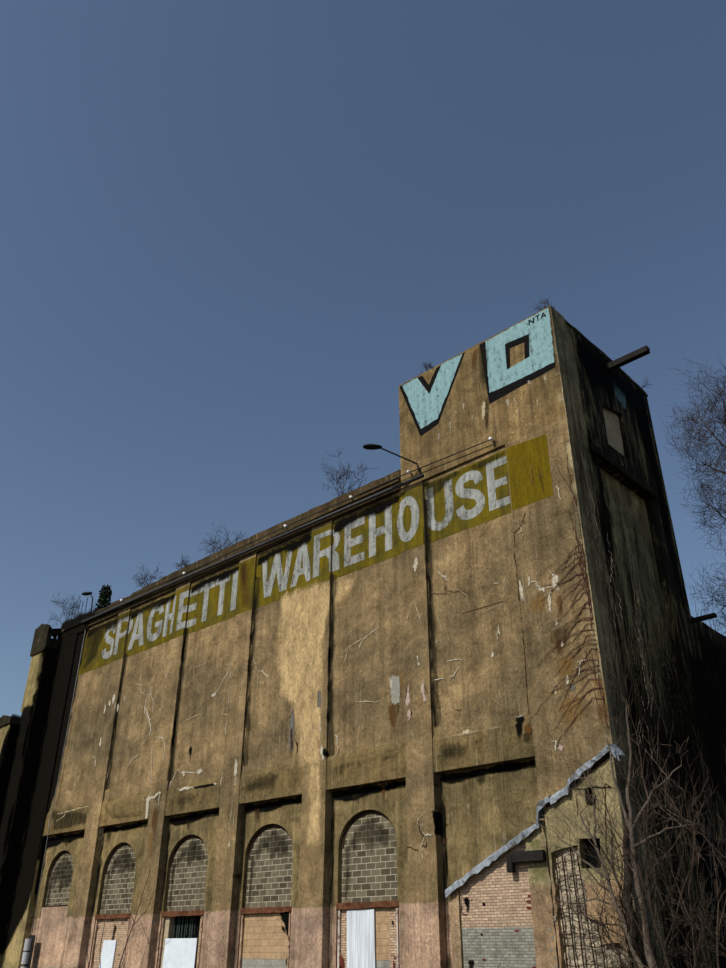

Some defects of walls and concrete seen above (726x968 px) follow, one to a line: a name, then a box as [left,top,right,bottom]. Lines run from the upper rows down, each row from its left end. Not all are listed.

crack [123,684,165,764]
crack [184,658,268,735]
peeling [389,675,427,720]
spalling [515,715,524,737]
crack [408,797,432,862]